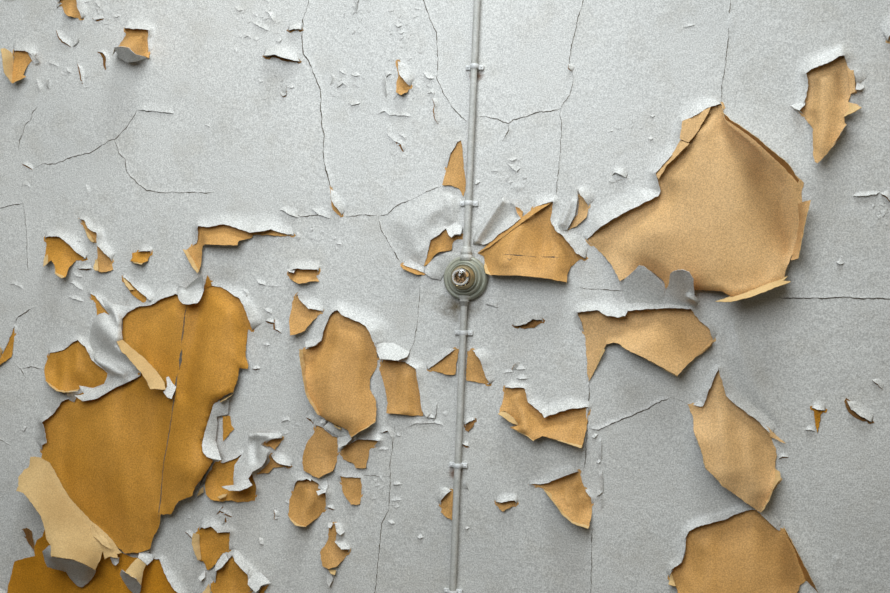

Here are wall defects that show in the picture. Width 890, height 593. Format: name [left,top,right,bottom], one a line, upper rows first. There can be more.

peeling [1,0,157,94]
crack [35,100,214,194]
crack [301,0,336,188]
crack [423,0,589,195]
peeling [400,91,811,380]
peeling [790,38,870,163]
crack [158,306,187,516]
crack [200,461,214,485]
peeling [0,205,607,593]
crack [578,382,687,471]
peeling [664,363,818,593]
peeling [805,398,828,432]